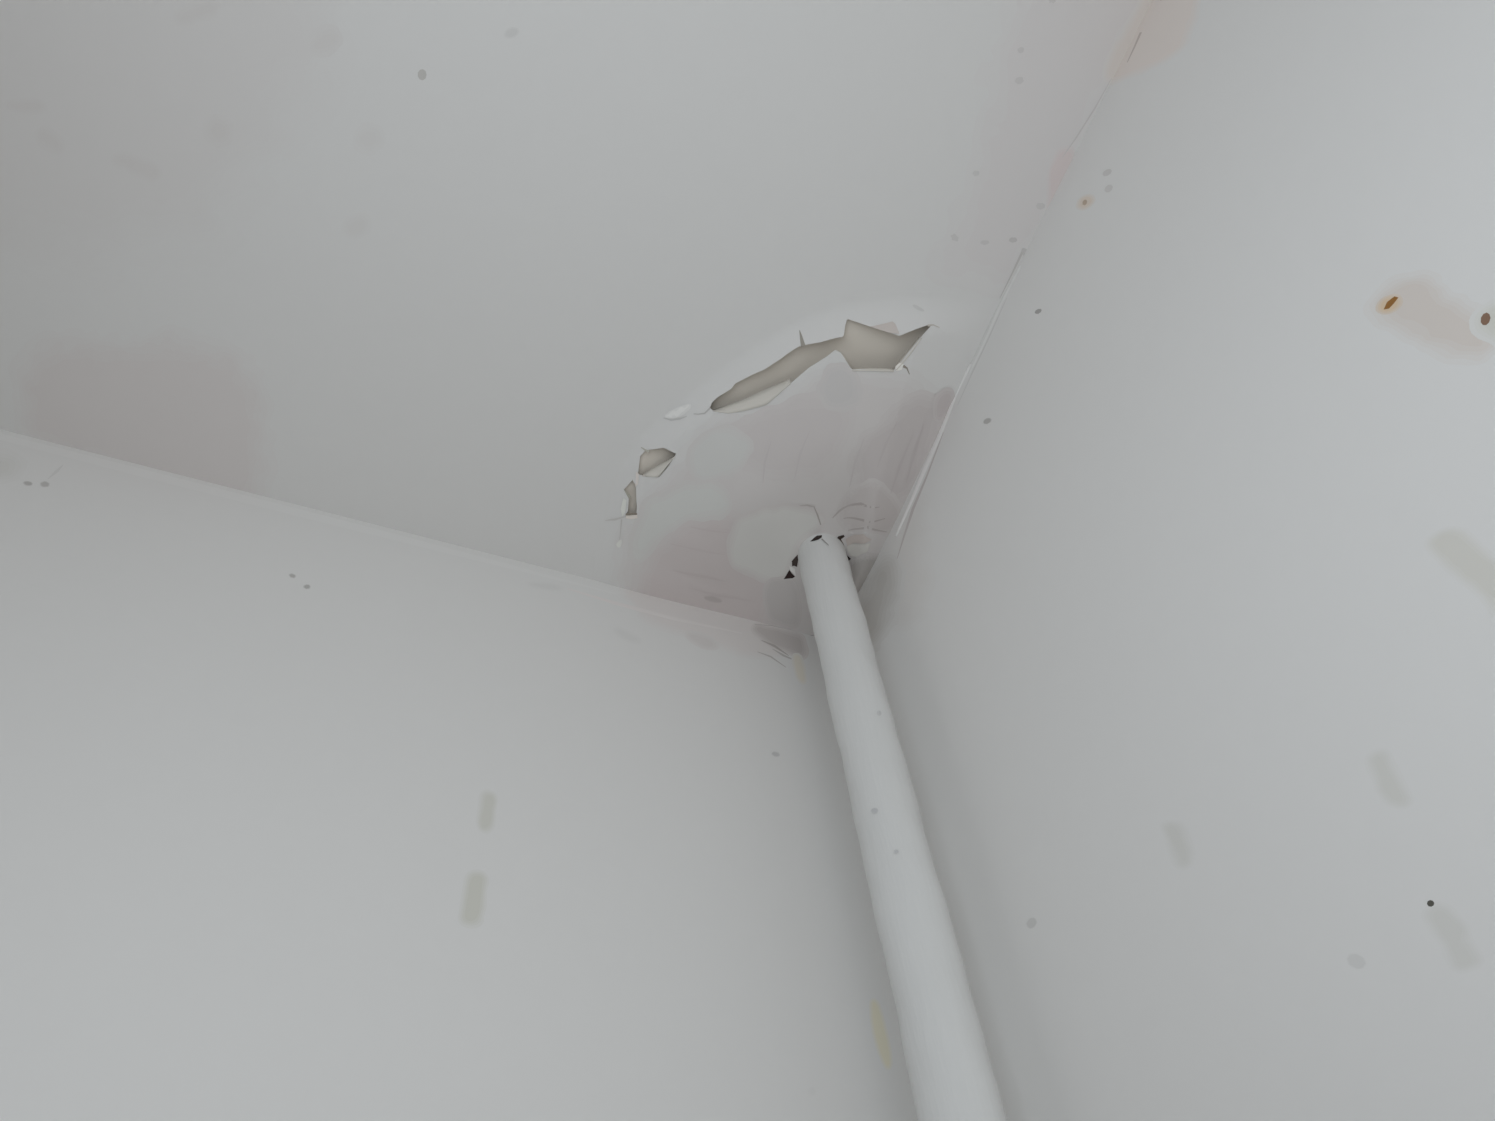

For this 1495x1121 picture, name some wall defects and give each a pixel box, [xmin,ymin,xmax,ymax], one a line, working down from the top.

peeling [590,291,1000,585]